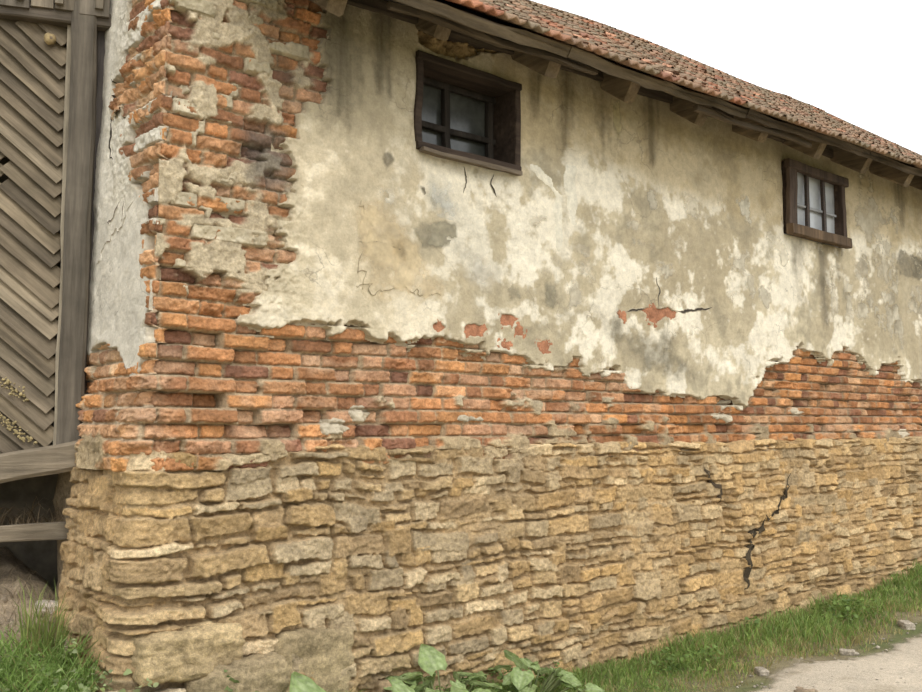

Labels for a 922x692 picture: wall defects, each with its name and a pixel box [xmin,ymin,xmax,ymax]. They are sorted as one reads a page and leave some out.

crack [97,198,133,264]
spalling [74,0,922,472]
crack [627,277,712,314]
crack [703,465,723,504]
crack [743,473,791,590]